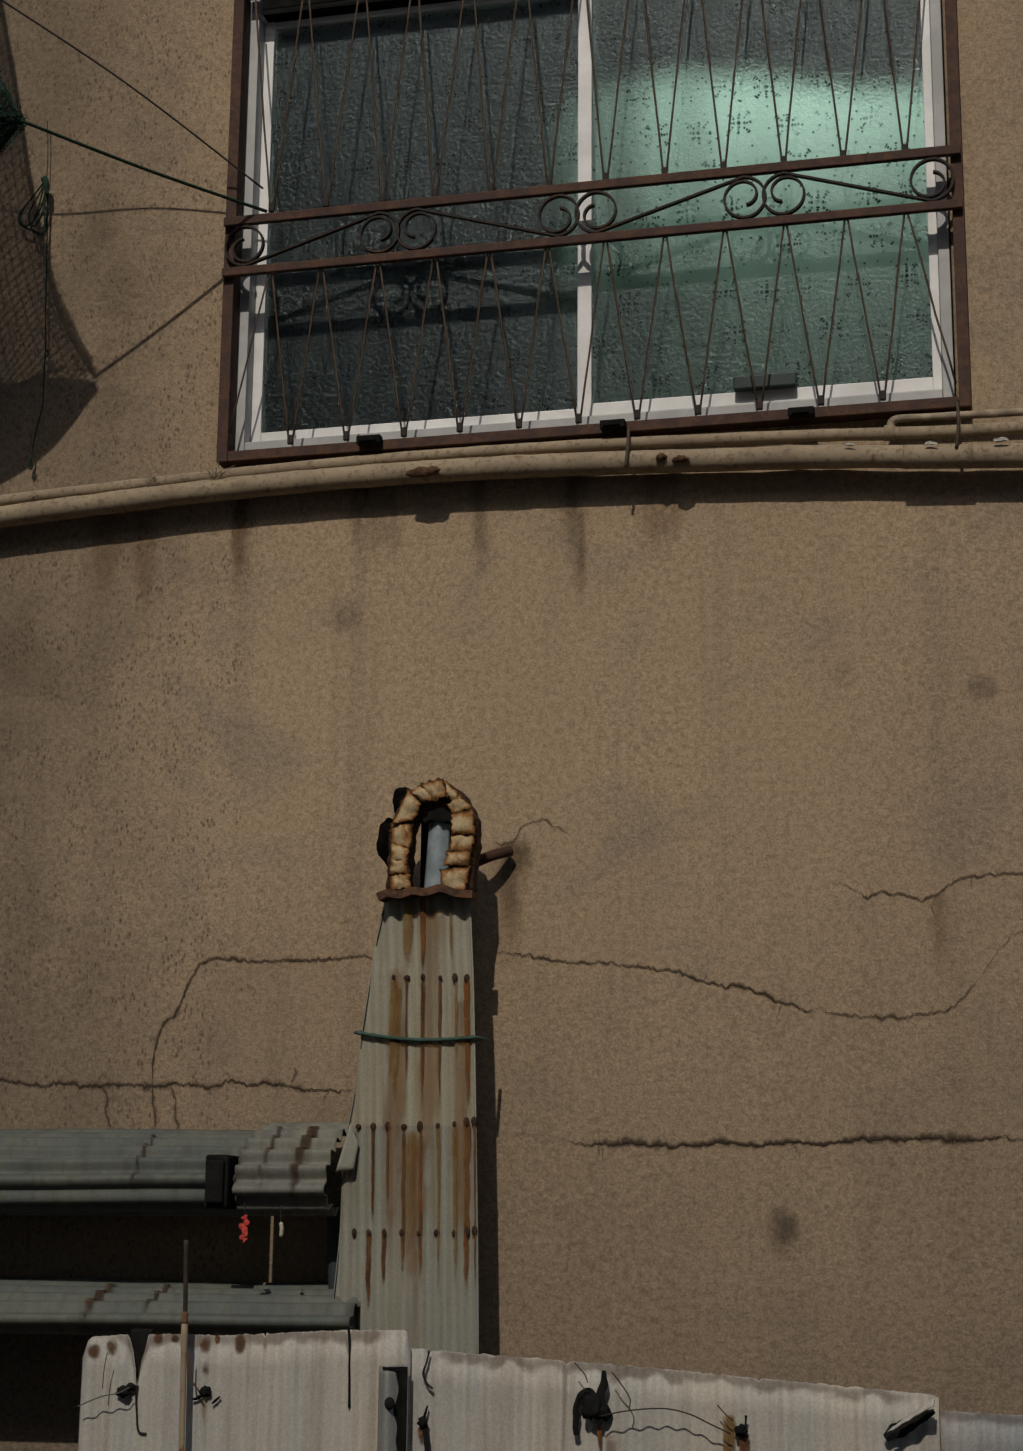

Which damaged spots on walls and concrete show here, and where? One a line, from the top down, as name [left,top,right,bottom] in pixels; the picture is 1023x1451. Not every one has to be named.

crack [830,872,1023,914]
crack [496,931,1023,1019]
crack [0,942,373,1129]
crack [516,1132,1023,1154]